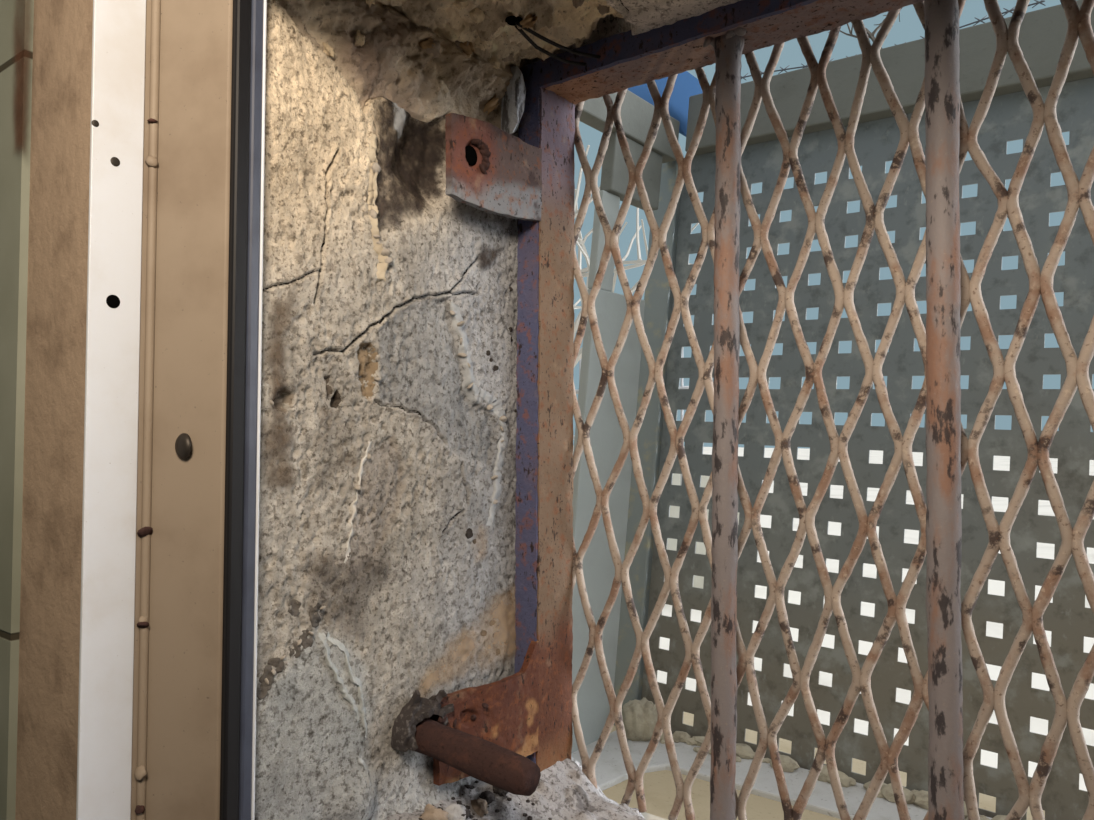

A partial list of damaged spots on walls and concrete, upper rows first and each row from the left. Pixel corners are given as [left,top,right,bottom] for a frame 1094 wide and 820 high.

spalling [277,0,624,134]
crack [263,151,337,290]
crack [314,262,474,355]
rust [488,593,516,655]